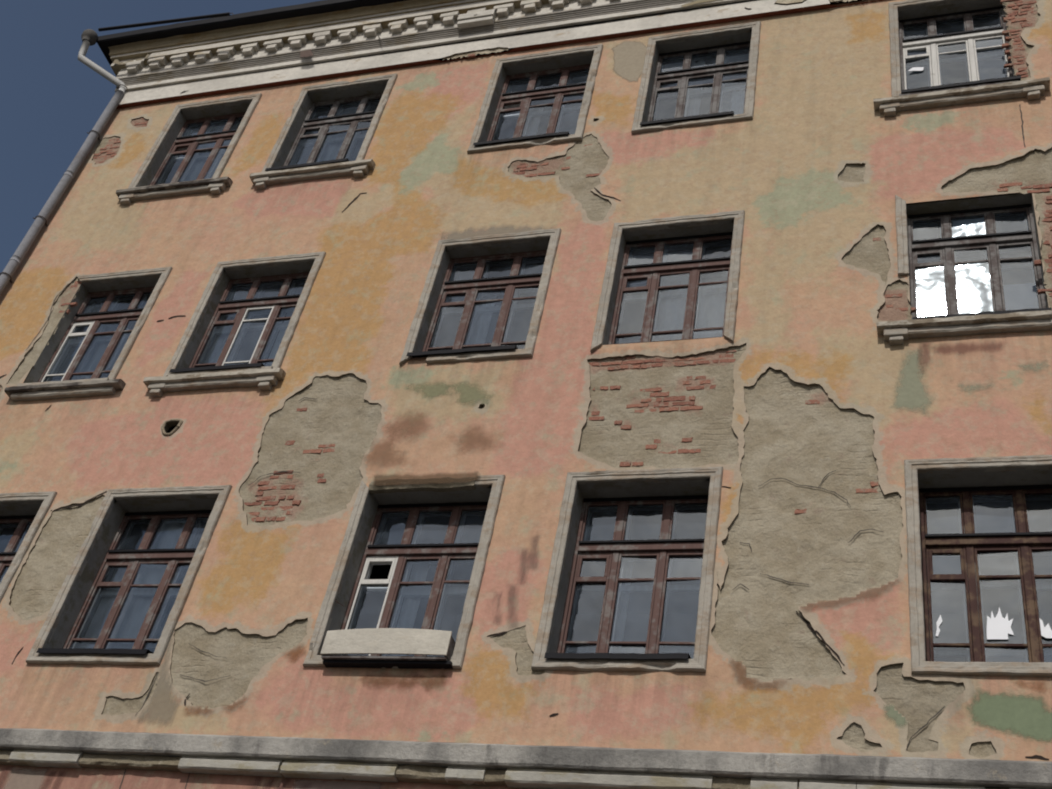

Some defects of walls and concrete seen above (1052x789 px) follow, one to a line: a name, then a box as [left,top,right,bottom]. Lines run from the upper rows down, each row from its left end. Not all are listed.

flaking render [1000,0,1041,81]
flaking render [92,136,121,165]
flaking render [507,118,612,221]
flaking render [842,224,916,321]
flaking render [941,147,1052,308]
flaking render [6,277,84,384]
flaking render [239,373,382,526]
flaking render [578,343,903,682]
flaking render [101,618,308,716]
flaking render [488,625,545,676]
flaking render [873,663,1052,752]
flaking render [969,741,996,758]